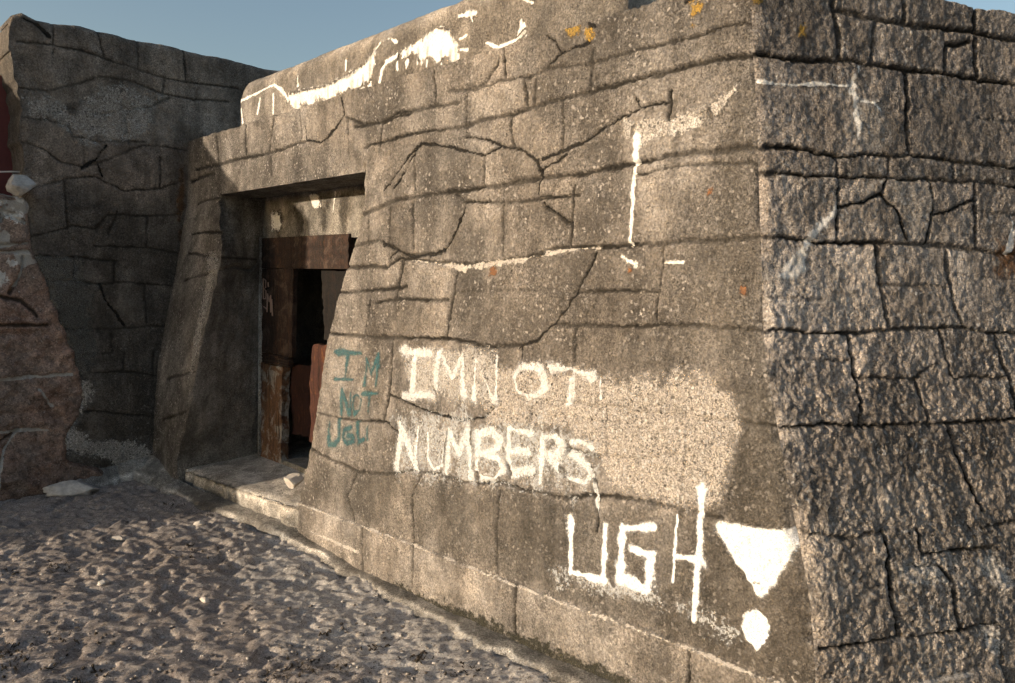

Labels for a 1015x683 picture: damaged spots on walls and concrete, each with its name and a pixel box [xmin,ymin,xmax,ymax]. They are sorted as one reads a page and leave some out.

crack [22,17,51,39]
crack [547,35,591,65]
crack [306,97,345,144]
crack [80,144,107,177]
crack [384,99,668,223]
crack [836,180,973,245]
corrosion [994,245,1015,276]
crack [98,283,125,326]
crack [382,210,601,374]
crack [879,530,897,631]